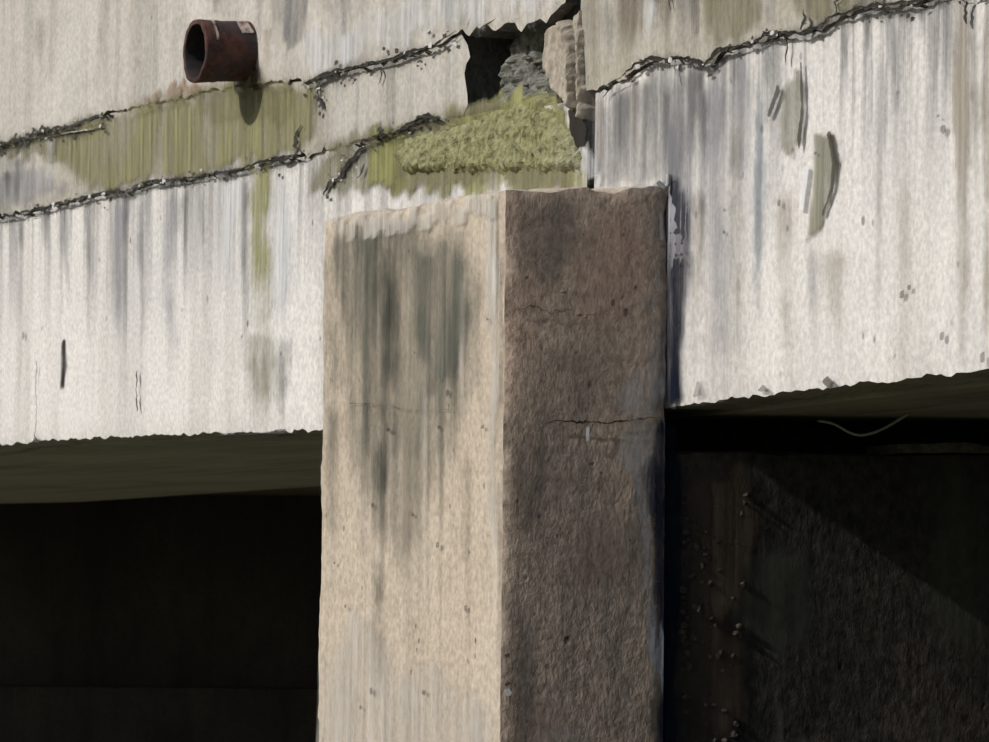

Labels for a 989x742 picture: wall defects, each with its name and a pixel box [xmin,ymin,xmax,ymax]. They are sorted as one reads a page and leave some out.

crack [0,31,456,220]
spalling [486,19,587,147]
crack [602,0,929,98]
crack [958,0,982,24]
water stain [221,170,239,263]
water stain [333,205,433,239]
water stain [459,198,497,318]
crack [546,417,659,439]